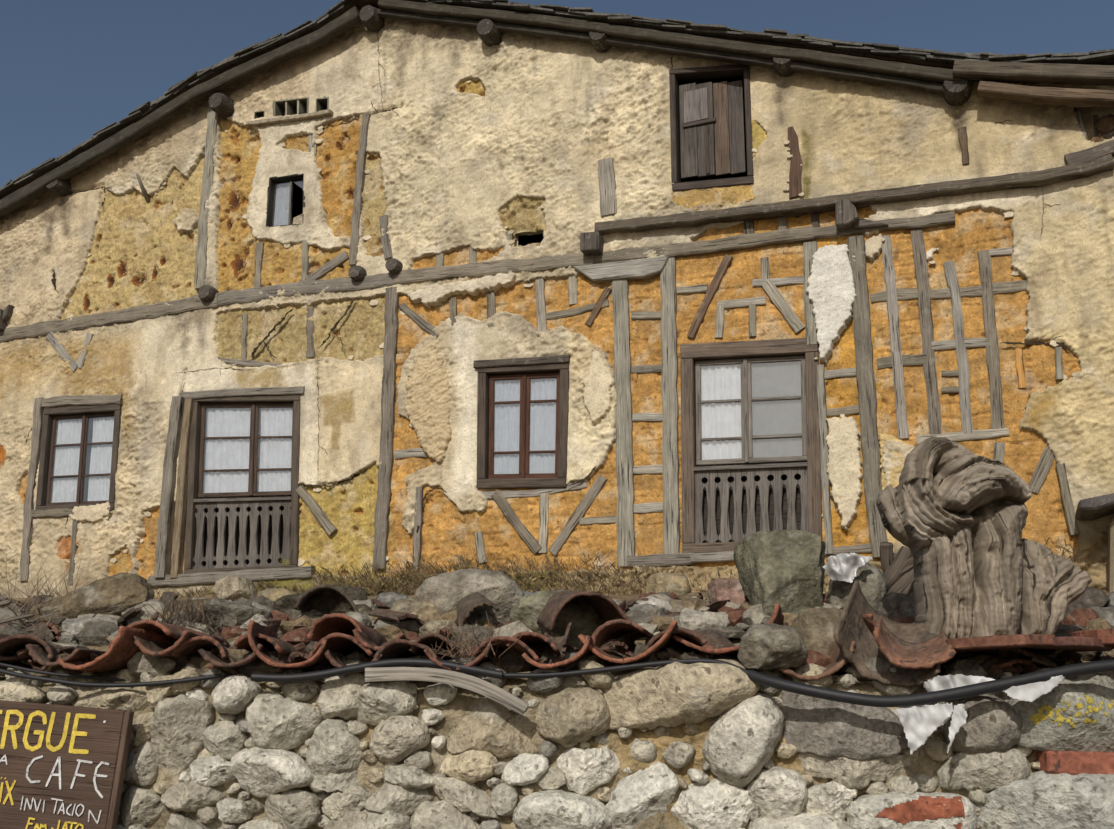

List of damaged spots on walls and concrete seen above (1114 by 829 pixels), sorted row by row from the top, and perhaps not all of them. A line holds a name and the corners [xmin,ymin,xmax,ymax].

flaking render [457,79,486,96]
flaking render [61,157,205,320]
flaking render [216,114,387,293]
flaking render [411,196,548,269]
flaking render [214,271,664,579]
flaking render [675,207,1081,563]
flaking render [109,507,160,581]